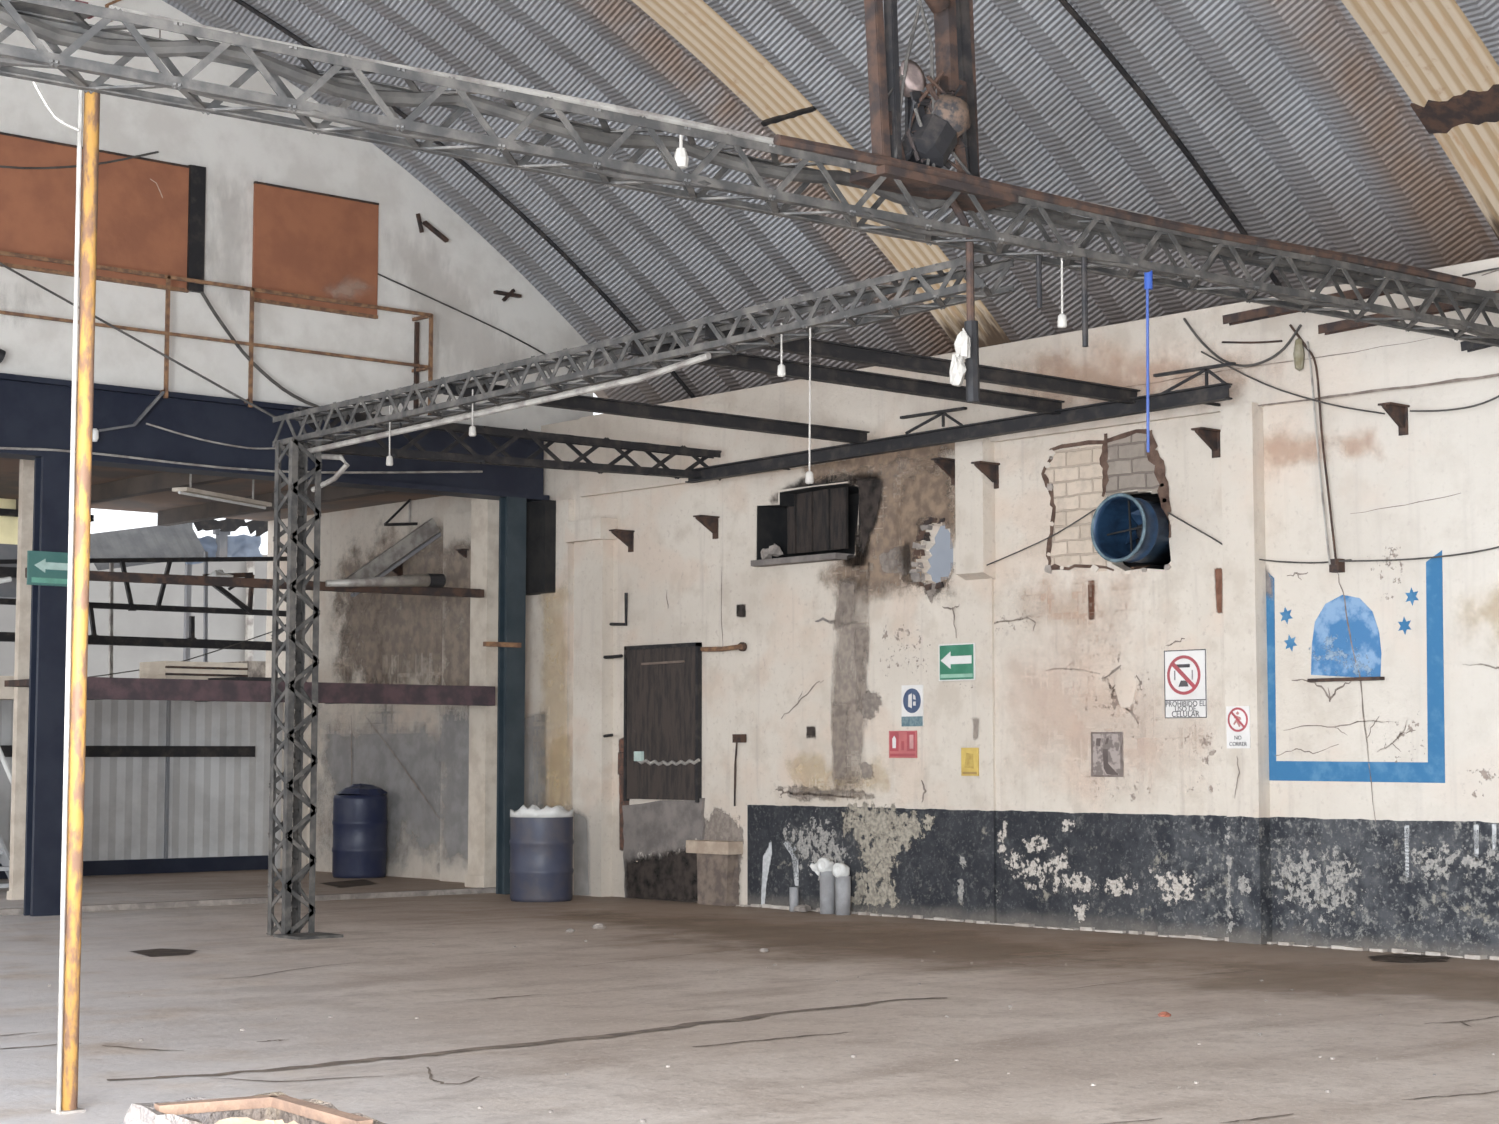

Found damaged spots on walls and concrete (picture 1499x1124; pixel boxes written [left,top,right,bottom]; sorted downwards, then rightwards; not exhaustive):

spalling [1041,429,1172,574]
damp [335,529,471,686]
damp [804,443,956,788]
spalling [879,517,951,602]
damp [325,707,469,861]
peeling [778,762,935,913]
peeling [957,854,966,903]
peeling [997,819,1202,923]
peeling [1225,826,1251,934]
peeling [1270,839,1376,931]
peeling [1409,841,1499,882]
crack [0,997,946,1084]